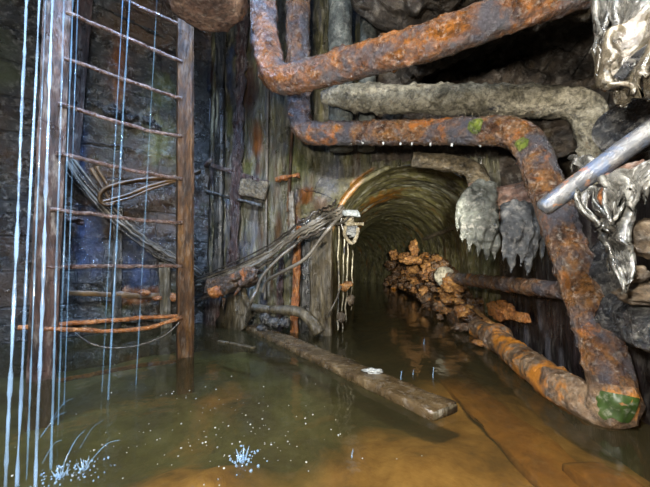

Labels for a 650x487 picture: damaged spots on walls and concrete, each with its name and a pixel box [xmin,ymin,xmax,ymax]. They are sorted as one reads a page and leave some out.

rust [332,169,373,229]
rust [272,210,301,306]
rust [486,300,531,323]